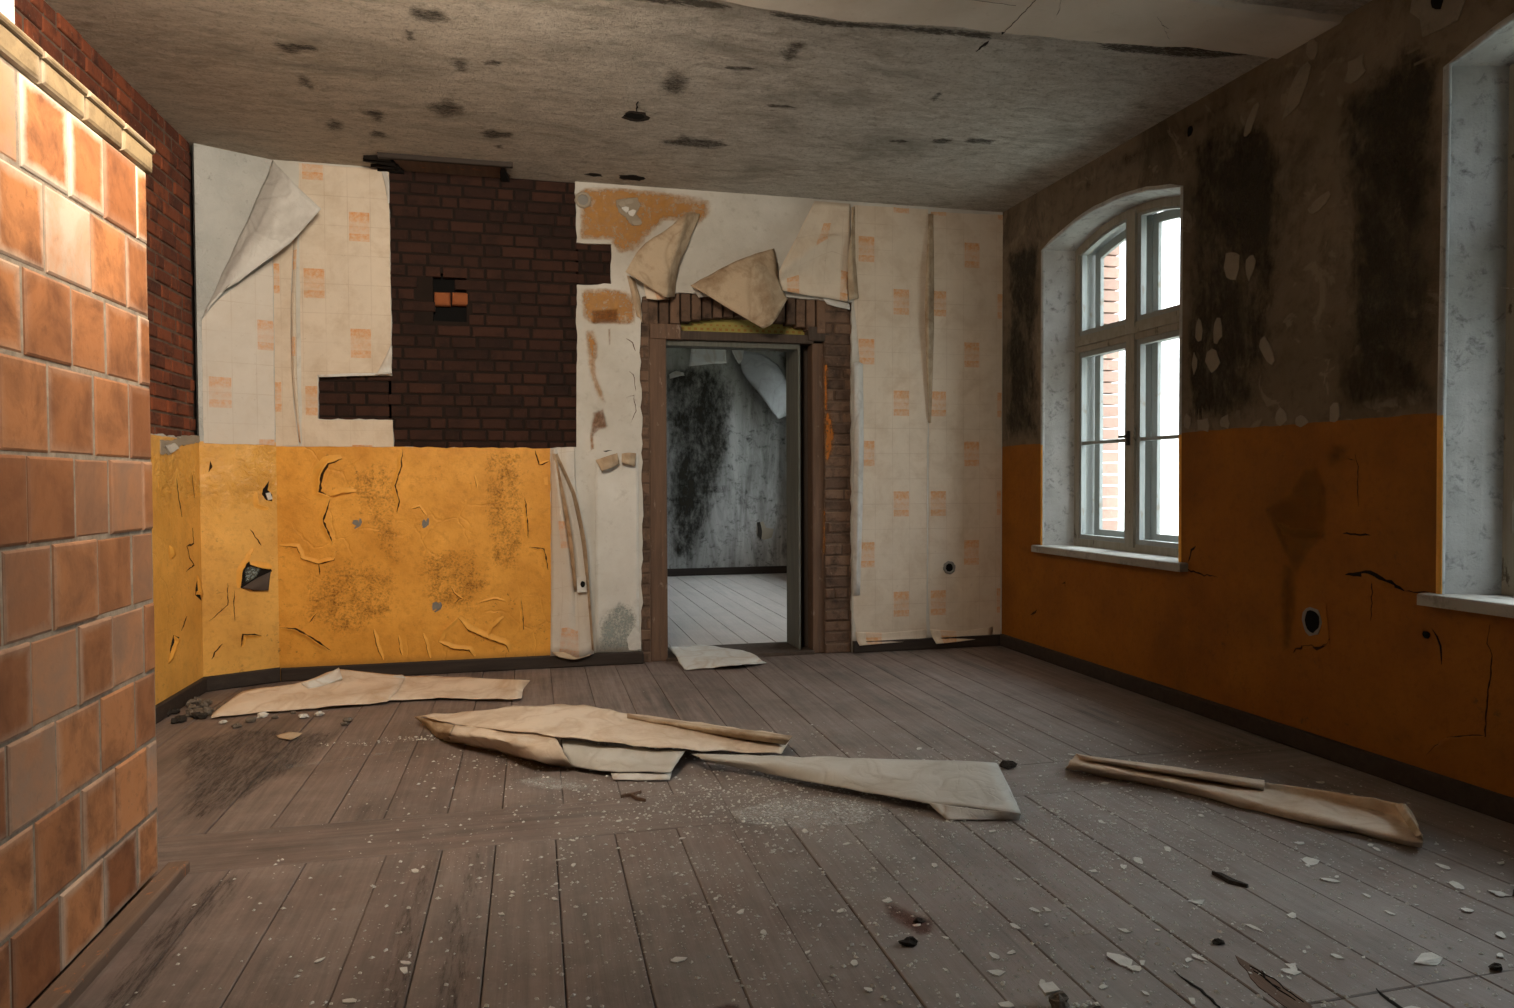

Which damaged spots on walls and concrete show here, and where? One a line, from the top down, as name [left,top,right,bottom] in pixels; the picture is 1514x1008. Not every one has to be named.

flaking render [14,0,321,455]
flaking render [319,171,646,528]
mould [1189,126,1279,419]
mould [1346,51,1434,403]
peeling [241,634,262,647]
peeling [236,547,272,588]
peeling [279,613,331,653]
peeling [280,455,356,574]
peeling [423,586,524,658]
mould [668,367,732,558]
crack [1343,455,1442,665]